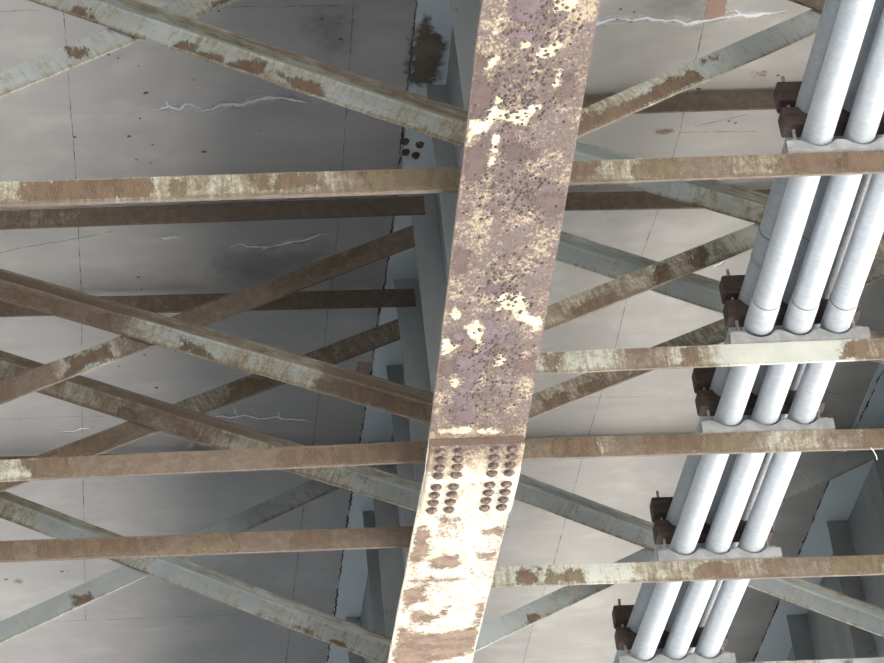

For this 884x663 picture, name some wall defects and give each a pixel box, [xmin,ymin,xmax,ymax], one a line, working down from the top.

crack [596,9,786,26]
water stain [405,17,447,87]
corrosion [174,40,326,97]
crack [153,96,313,112]
corrosion [359,133,542,190]
corrosion [766,151,884,175]
corrosion [13,178,155,201]
crack [229,234,327,249]
crack [216,408,312,423]
corrosion [481,526,505,538]
corrosion [36,537,165,558]
corrosion [392,525,486,663]